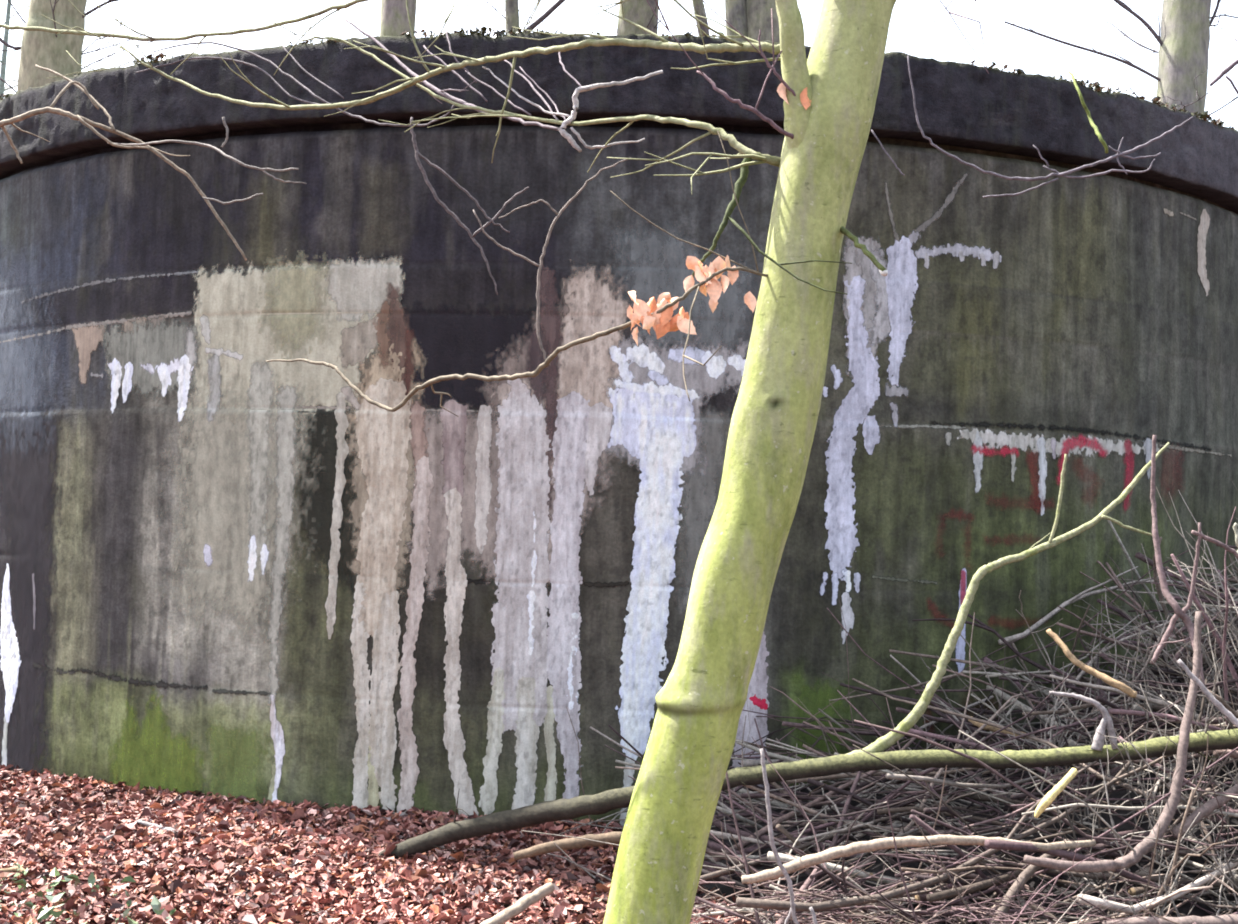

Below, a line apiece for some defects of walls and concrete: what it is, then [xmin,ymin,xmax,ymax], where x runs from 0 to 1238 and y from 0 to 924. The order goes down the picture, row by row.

water stain [0,271,369,803]
peeling [171,258,405,641]
corrosion [375,283,414,396]
water stain [579,230,753,610]
water stain [956,624,966,673]
water stain [945,428,1159,516]